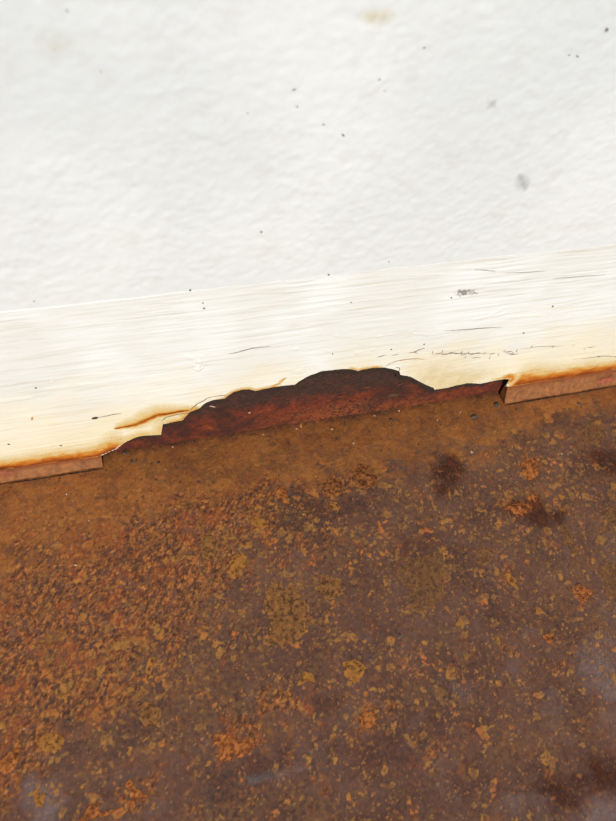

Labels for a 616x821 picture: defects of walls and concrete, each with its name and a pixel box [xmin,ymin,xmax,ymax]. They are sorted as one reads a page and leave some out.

corrosion [220,378,286,399]
spalling [110,367,509,452]
corrosion [0,407,201,470]
corrosion [518,458,539,482]
corrosion [506,494,563,526]
corrosion [264,584,318,646]
corrosion [342,659,367,684]
corrosion [359,708,379,732]
corrosion [0,736,22,775]
corrosion [35,733,65,753]
corrosion [213,734,256,763]